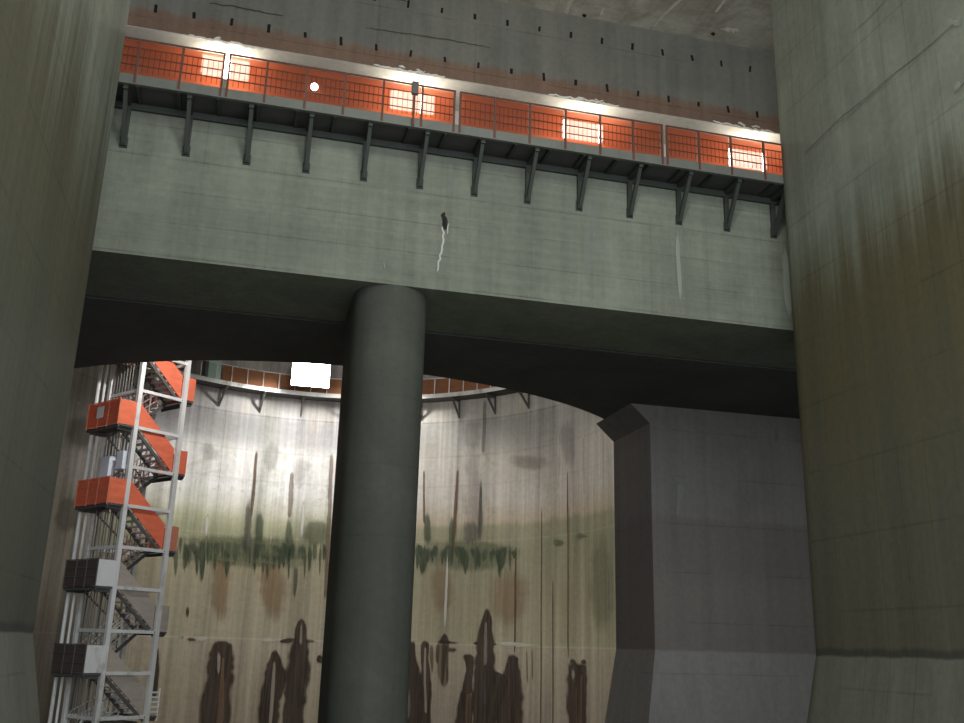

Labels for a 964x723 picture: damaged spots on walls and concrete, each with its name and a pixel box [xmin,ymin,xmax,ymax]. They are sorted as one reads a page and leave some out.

crack [807,26,951,151]
crack [437,212,448,271]
corrosion [430,634,457,683]